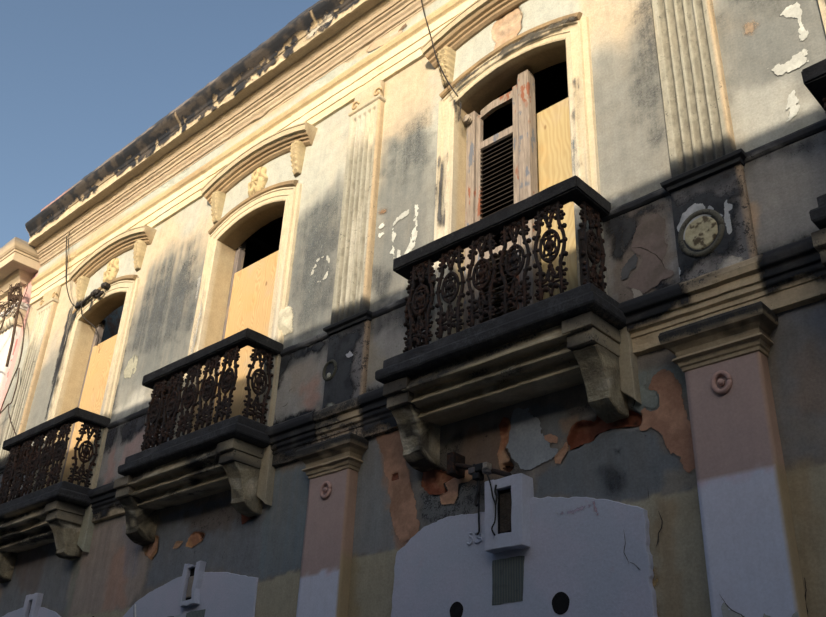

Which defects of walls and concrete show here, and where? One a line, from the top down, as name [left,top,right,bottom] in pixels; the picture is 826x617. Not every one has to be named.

flaking render [491,7,522,49]
peeling [772,2,809,76]
leakage [25,0,359,237]
peeling [786,90,800,122]
peeling [378,204,419,259]
flaking render [621,213,674,298]
leakage [130,264,202,354]
flaking render [497,369,695,473]
flaking render [376,431,472,543]